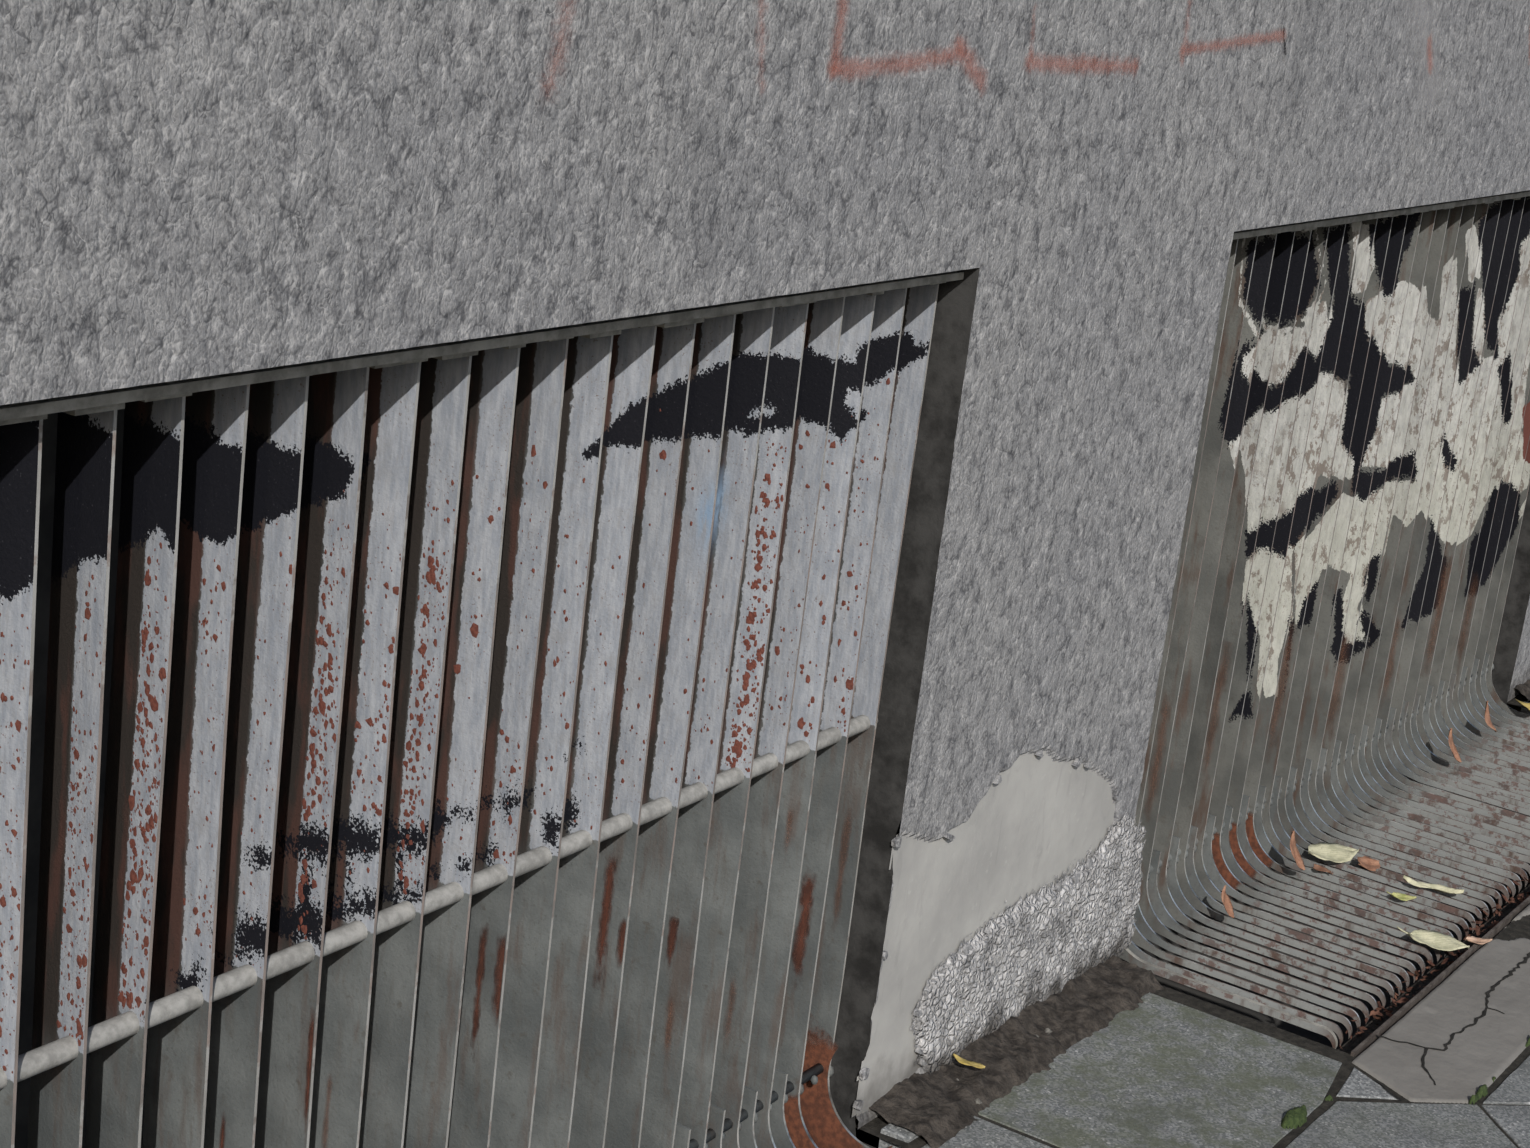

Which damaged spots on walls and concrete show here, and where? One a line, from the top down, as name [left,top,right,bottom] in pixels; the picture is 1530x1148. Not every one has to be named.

rust [0,876,21,1074]
rust [0,686,27,771]
rust [56,575,101,1046]
rust [117,542,169,1017]
rust [296,513,401,940]
rust [397,540,461,895]
rust [597,861,626,978]
rust [669,430,879,772]
rust [784,1031,863,1148]
spalling [852,750,1120,1119]
rust [1212,814,1273,896]
crack [1376,952,1530,1100]